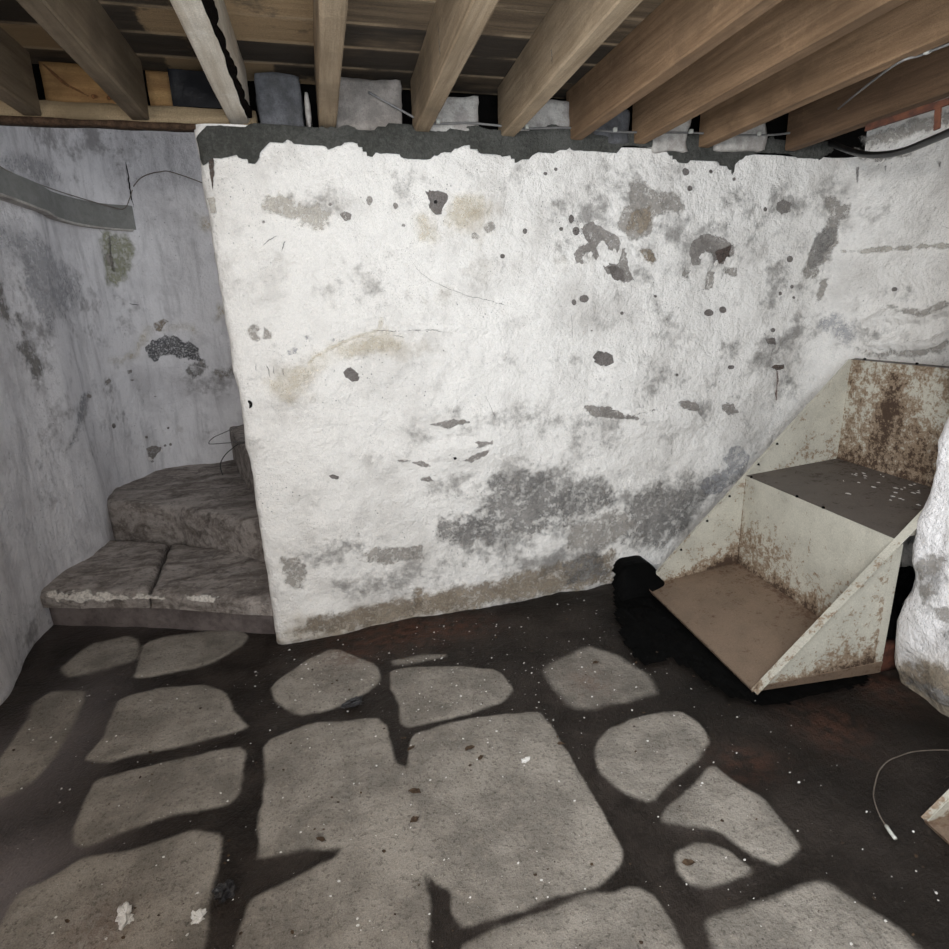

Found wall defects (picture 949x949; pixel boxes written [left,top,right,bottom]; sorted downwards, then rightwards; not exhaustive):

peeling [559,214,634,287]
peeling [689,234,738,269]
water stain [281,557,307,588]
water stain [295,447,749,633]